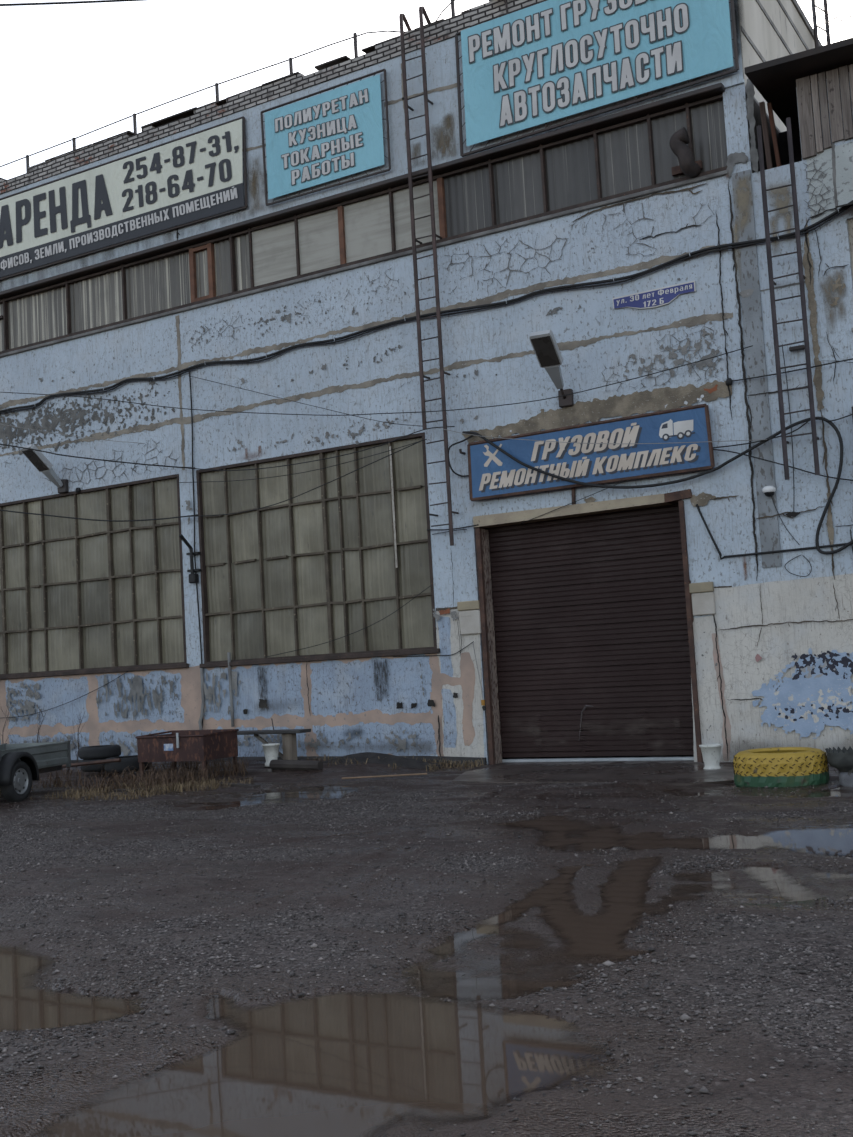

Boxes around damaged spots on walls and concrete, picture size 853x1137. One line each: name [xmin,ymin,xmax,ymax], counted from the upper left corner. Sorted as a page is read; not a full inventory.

crack [804,158,849,284]
peeling [0,381,176,456]
crack [444,182,853,759]
peeling [6,670,178,756]
peeling [298,727,421,753]
peeling [752,648,853,739]